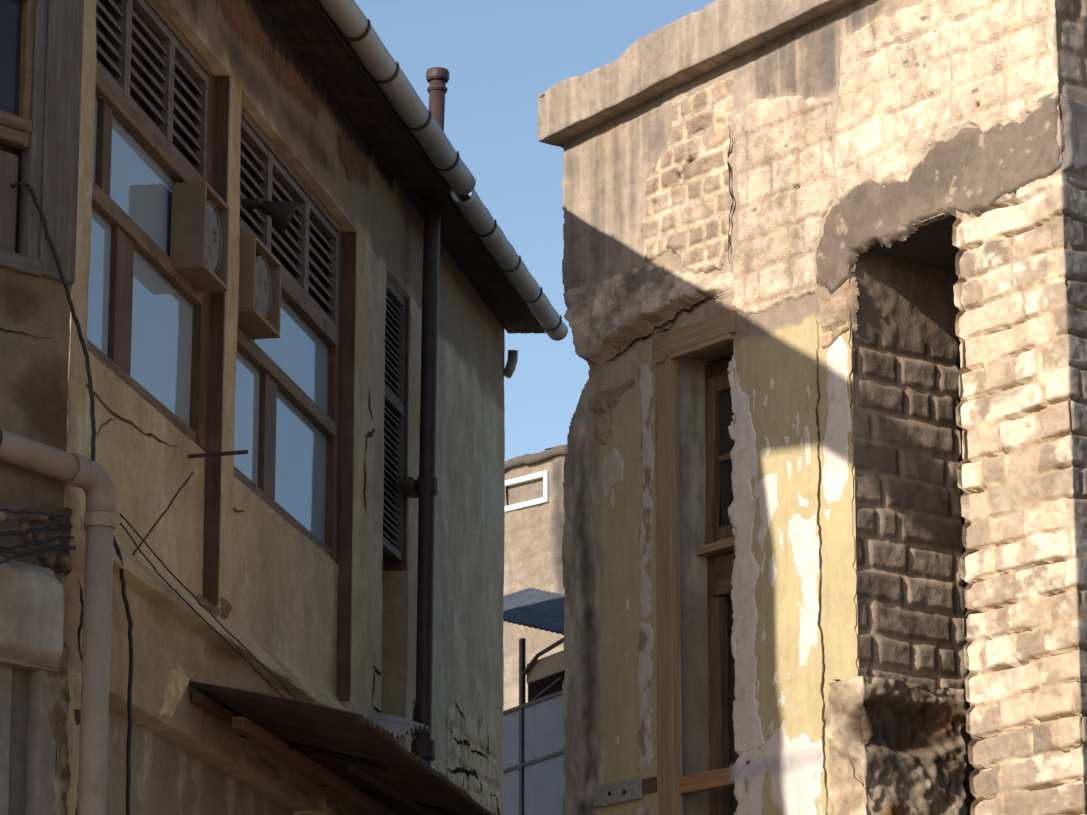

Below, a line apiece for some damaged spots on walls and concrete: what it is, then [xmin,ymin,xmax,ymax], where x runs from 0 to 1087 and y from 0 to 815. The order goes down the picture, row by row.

crack [0,328,46,339]
crack [86,382,178,446]
crack [597,128,736,371]
spalling [641,0,1059,815]
peeling [587,360,655,771]
flaking render [445,701,501,815]